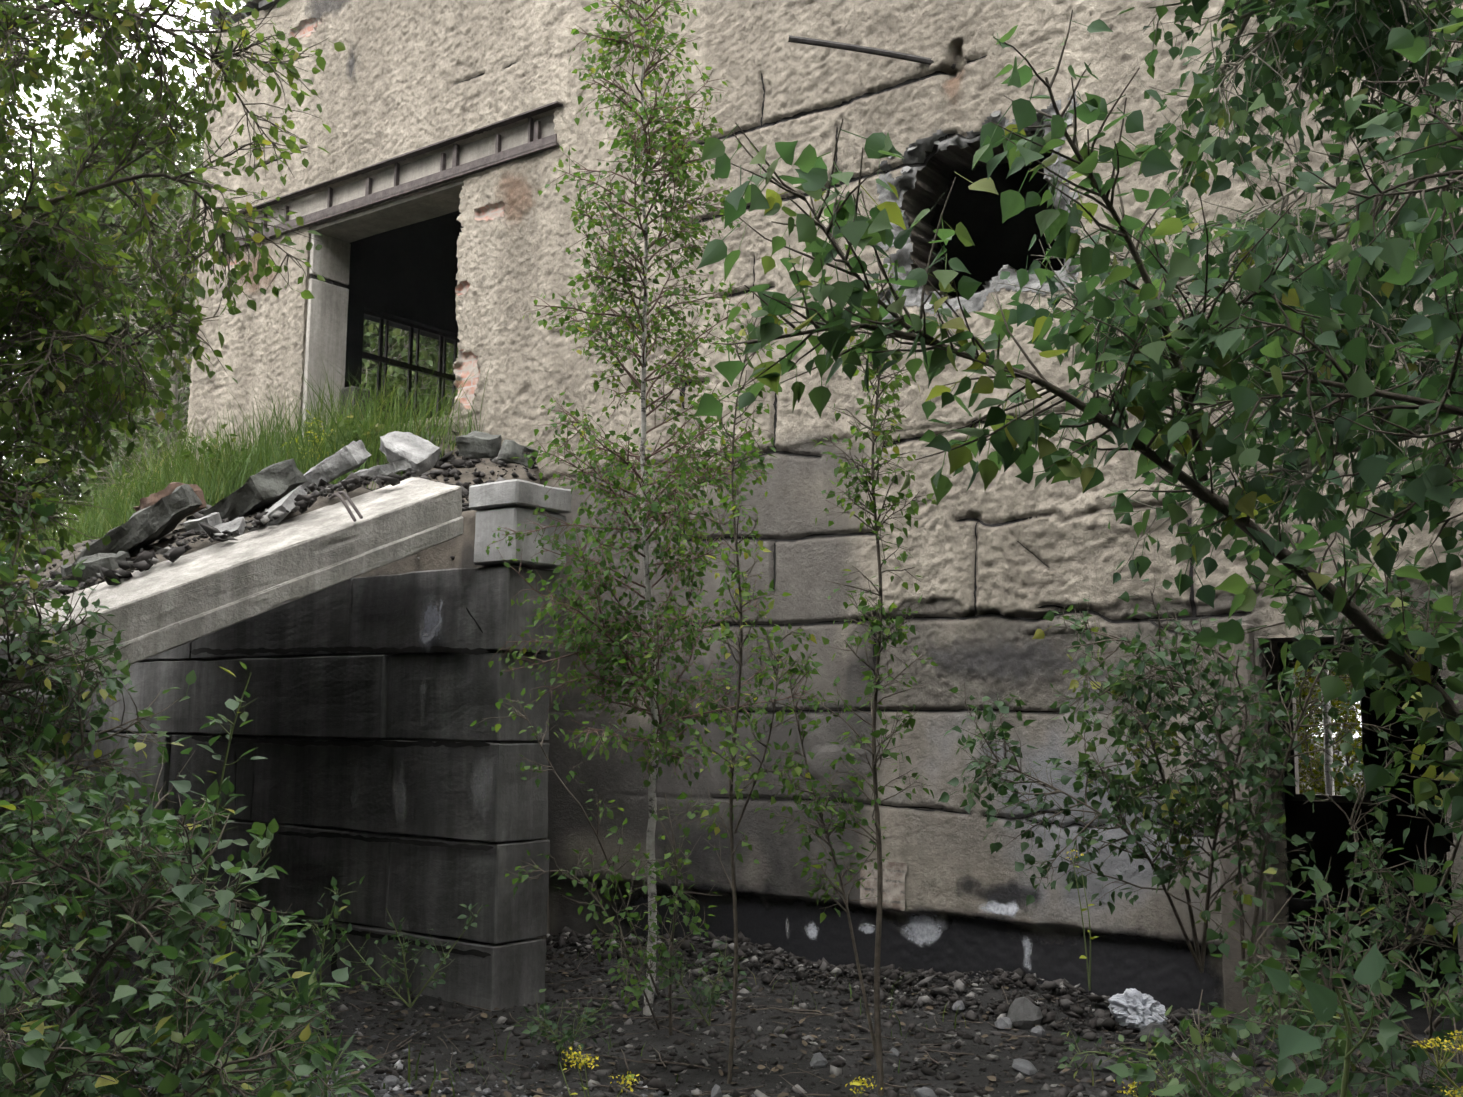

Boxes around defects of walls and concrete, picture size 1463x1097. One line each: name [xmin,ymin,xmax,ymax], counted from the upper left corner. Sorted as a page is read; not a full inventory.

spalling [876,91,1082,320]
flaking render [453,349,481,409]